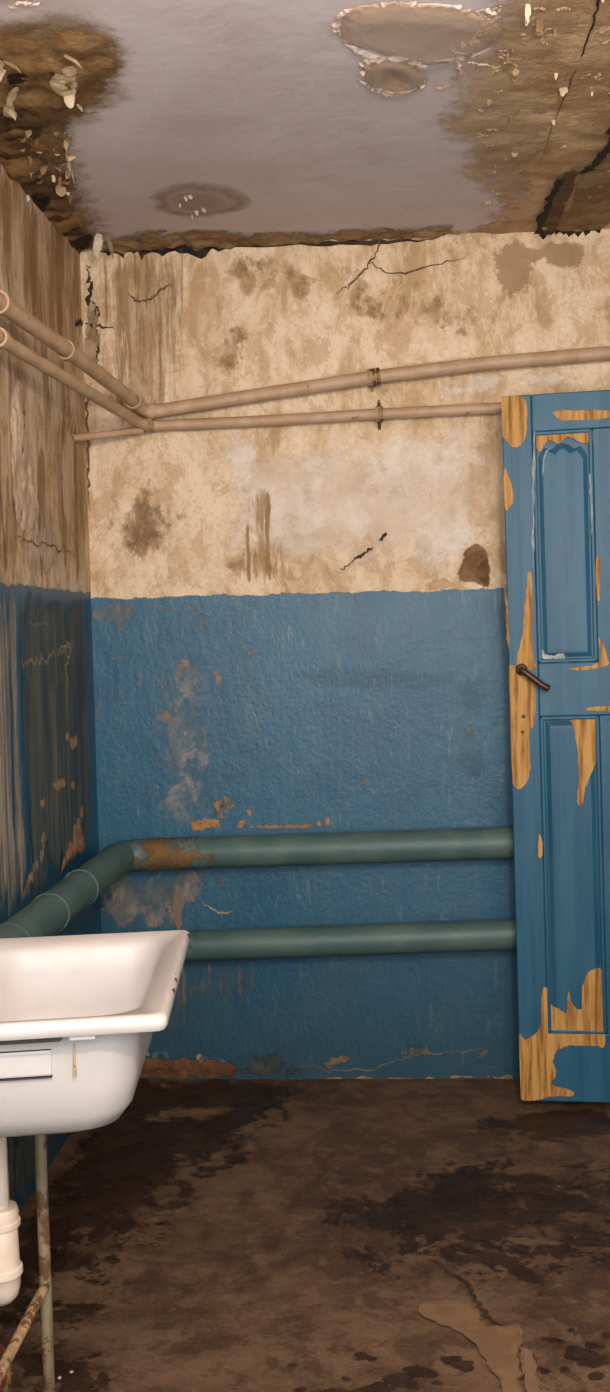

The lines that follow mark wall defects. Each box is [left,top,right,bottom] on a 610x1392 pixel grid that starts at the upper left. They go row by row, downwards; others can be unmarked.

crack [538,0,600,166]
flaking render [534,171,578,234]
leakage [123,492,159,556]
leakage [0,592,94,918]
corrosion [132,837,212,871]
leakage [478,1107,610,1142]
leakage [322,1159,610,1286]
crack [426,1259,528,1392]